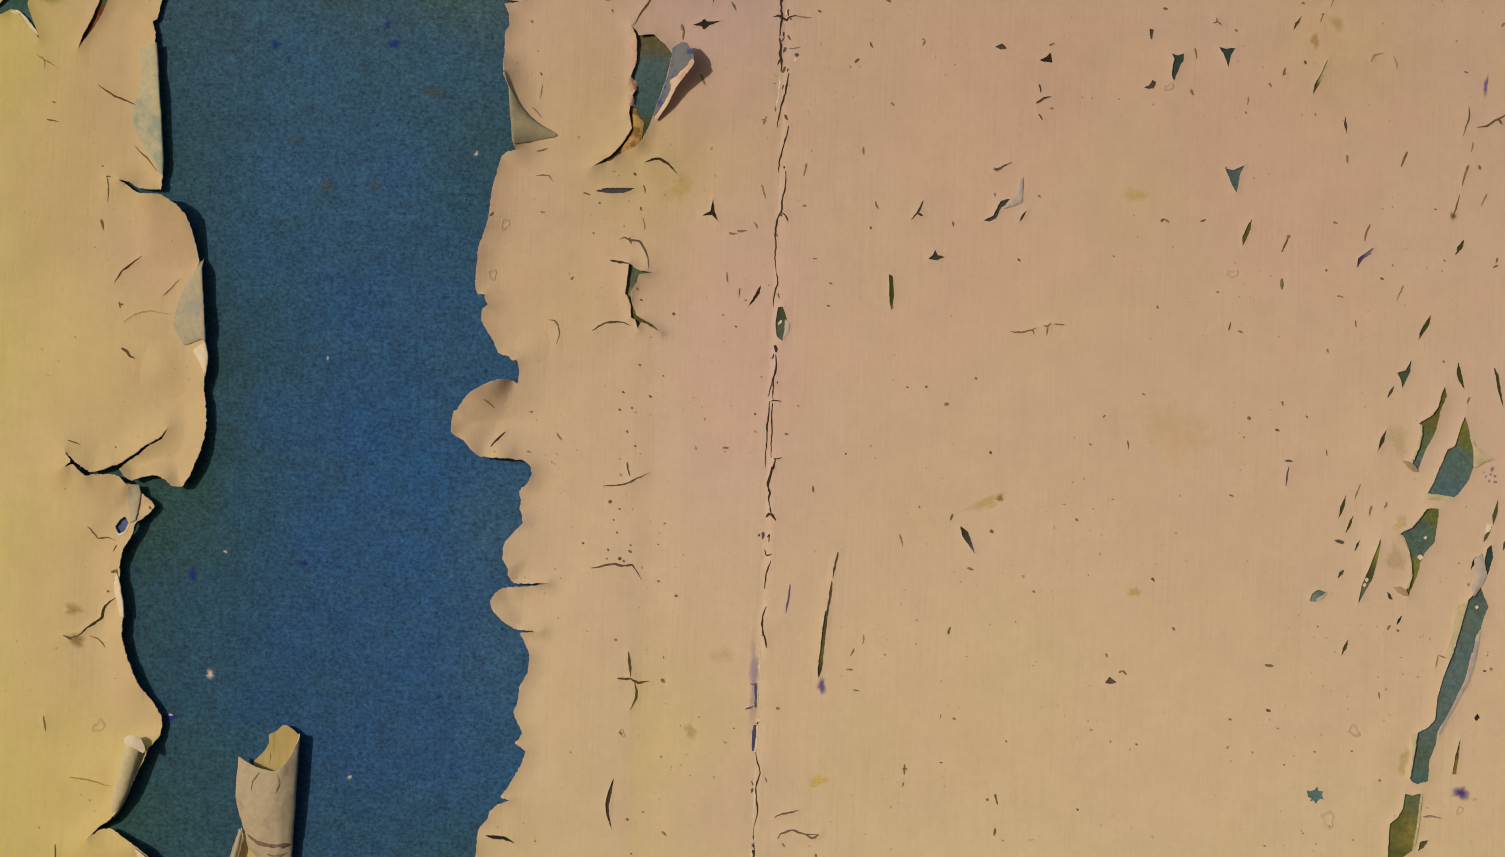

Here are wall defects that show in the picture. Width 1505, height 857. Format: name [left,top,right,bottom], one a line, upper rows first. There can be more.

peeling [0,0,39,38]
peeling [596,28,695,165]
peeling [984,177,1026,222]
peeling [1226,166,1244,192]
peeling [626,264,658,330]
peeling [66,0,557,857]
crack [745,0,819,857]
peeling [1387,361,1494,600]
peeling [1335,496,1360,551]
crack [825,552,839,626]
peeling [1359,540,1381,602]
peeling [1388,501,1505,857]